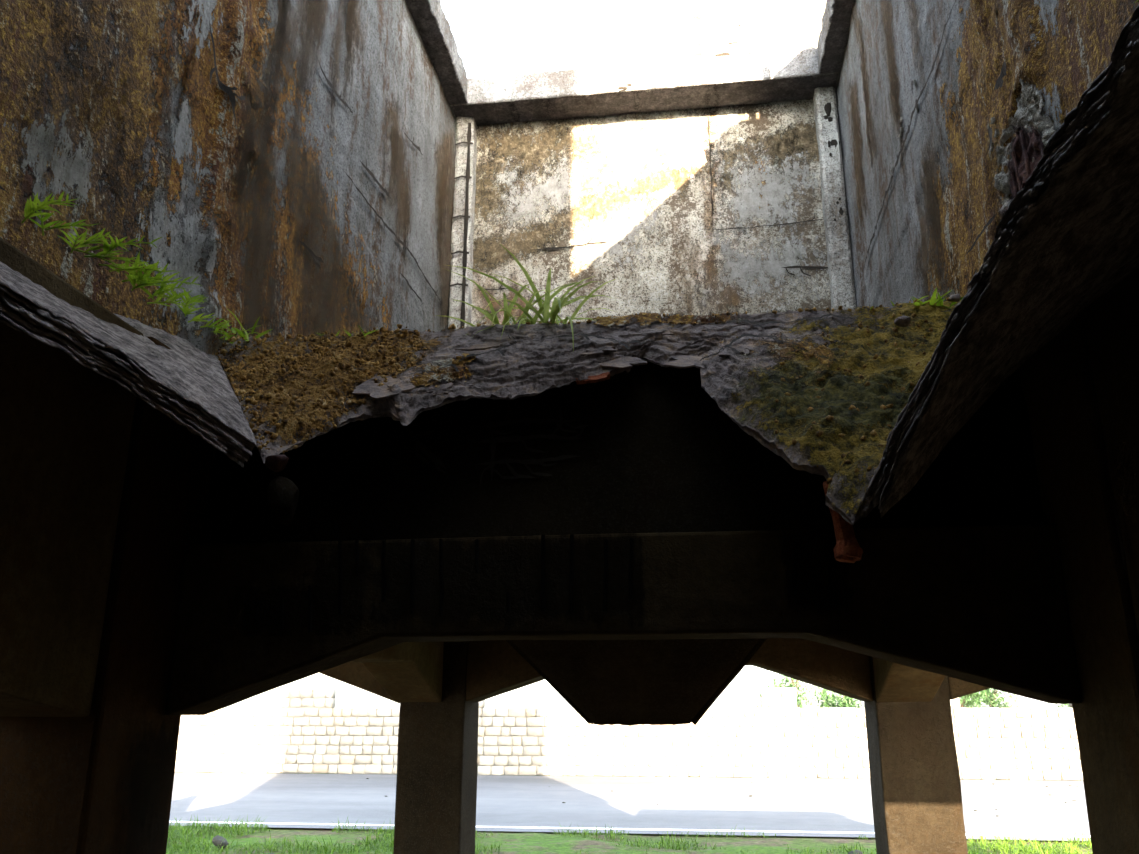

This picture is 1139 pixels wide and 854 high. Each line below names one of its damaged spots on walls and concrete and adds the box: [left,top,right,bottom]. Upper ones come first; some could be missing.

damp [234,0,365,337]
damp [383,102,411,261]
damp [435,134,455,329]
damp [407,0,877,229]
crack [689,313,865,383]
crack [782,266,828,277]
crack [861,3,955,278]
damp [880,0,947,302]
spalling [990,78,1067,217]
corrosion [926,0,1139,301]